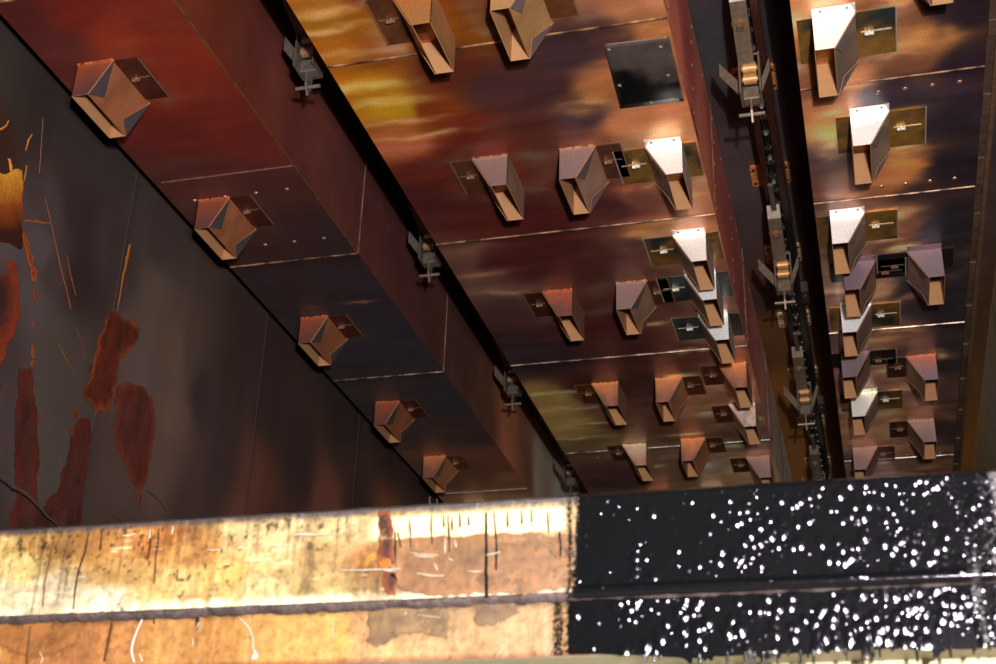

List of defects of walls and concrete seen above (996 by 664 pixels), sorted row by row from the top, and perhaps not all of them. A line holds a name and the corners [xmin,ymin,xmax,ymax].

rust [9,244,156,529]
crack [0,473,59,606]
rust [362,510,401,595]